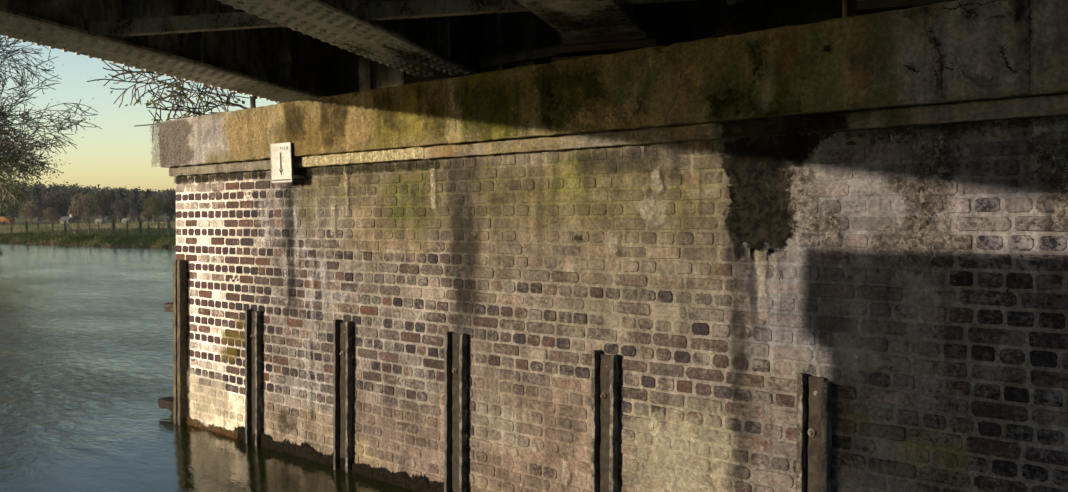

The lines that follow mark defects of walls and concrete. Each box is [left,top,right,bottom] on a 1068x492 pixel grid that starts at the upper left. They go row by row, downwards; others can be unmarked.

crack [904,0,1019,98]
water stain [284,104,304,138]
water stain [300,98,425,178]
water stain [720,100,848,298]